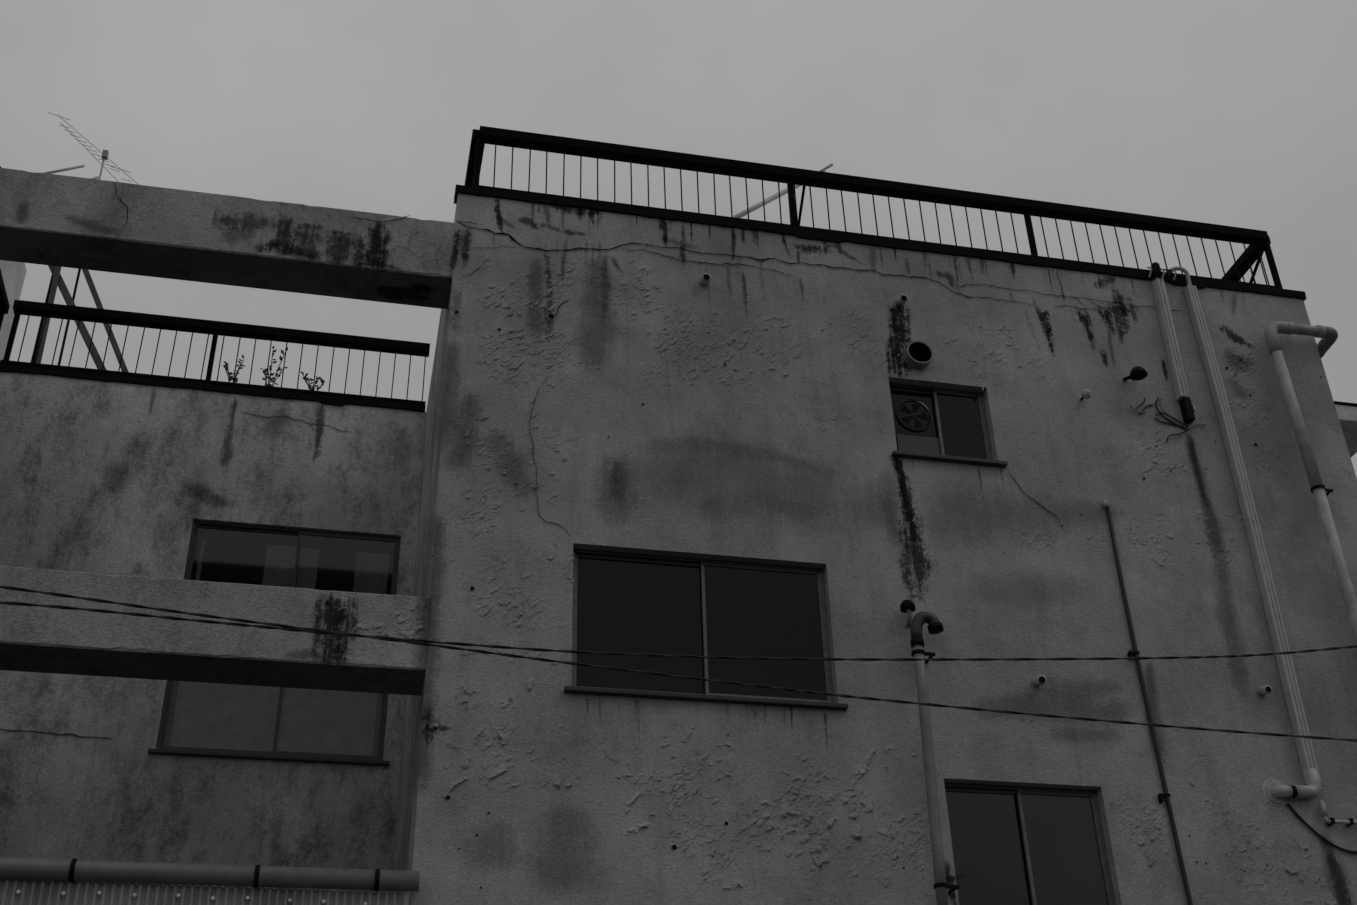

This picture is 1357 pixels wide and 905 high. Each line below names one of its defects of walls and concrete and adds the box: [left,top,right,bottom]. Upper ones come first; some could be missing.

water stain [255,216,438,302]
water stain [519,204,602,235]
water stain [659,218,692,263]
crack [353,215,1181,311]
water stain [796,243,855,259]
water stain [887,305,912,377]
water stain [1037,309,1054,353]
water stain [1077,276,1137,367]
water stain [892,457,932,599]
peeling [438,635,568,666]